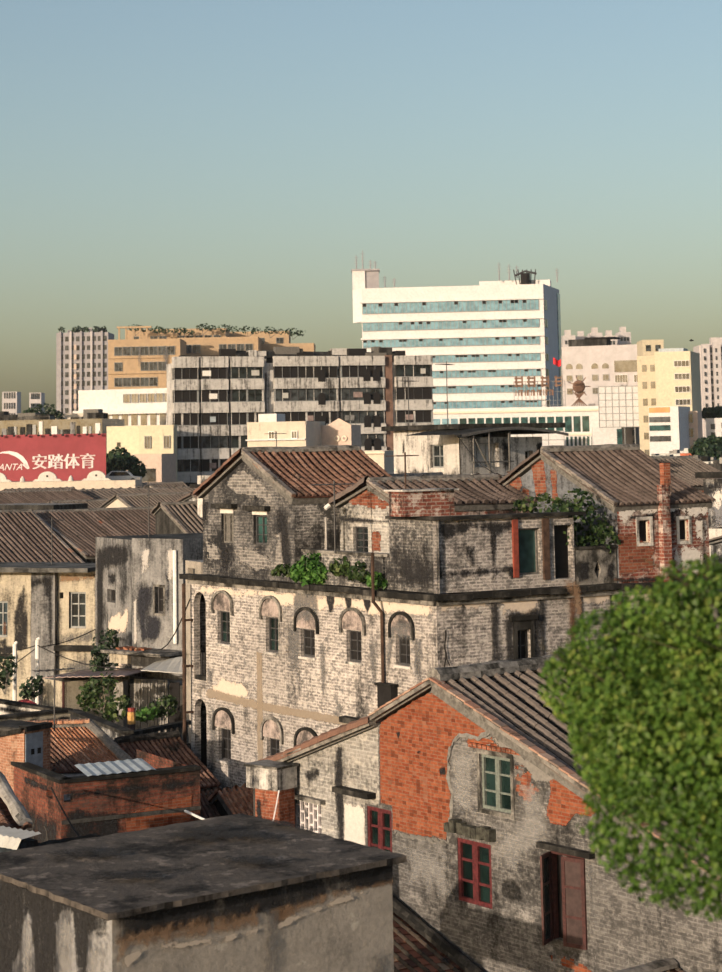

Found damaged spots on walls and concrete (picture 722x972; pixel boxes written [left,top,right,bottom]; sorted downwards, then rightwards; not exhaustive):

damp [394,520,513,584]
flaking render [618,533,655,575]
peeling [674,517,707,575]
damp [674,484,722,580]
damp [0,545,173,673]
flaking render [379,693,499,844]
flaking render [546,779,596,826]
damp [0,865,393,972]